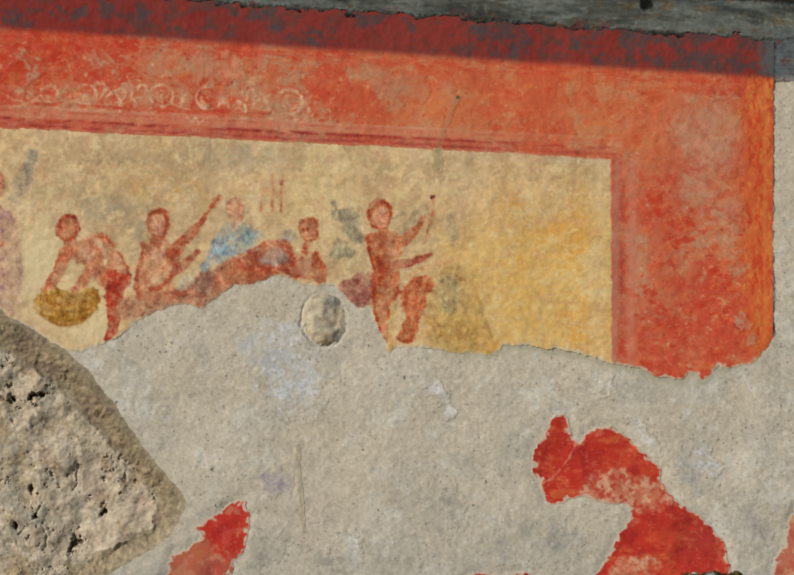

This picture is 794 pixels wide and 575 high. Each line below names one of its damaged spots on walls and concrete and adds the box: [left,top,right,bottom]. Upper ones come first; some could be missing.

peeling [13,46,48,85]
peeling [82,47,121,80]
peeling [732,310,760,347]
spalling [0,391,50,404]
peeling [573,463,679,517]
spalling [11,512,38,532]
spalling [98,501,109,519]
spalling [65,530,87,557]
peeling [604,551,664,575]